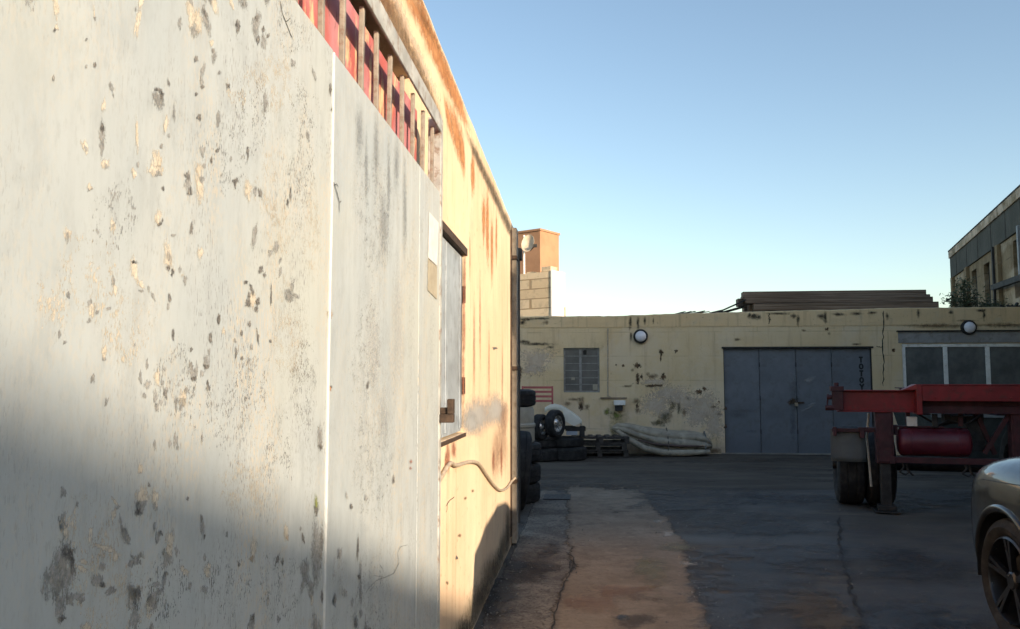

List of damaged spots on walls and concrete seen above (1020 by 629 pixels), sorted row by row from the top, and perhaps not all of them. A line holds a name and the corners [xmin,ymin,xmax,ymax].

peeling [131,80,176,190]
peeling [178,0,300,118]
rust [408,0,475,190]
peeling [31,146,321,412]
peeling [40,464,211,629]
crack [836,517,866,629]